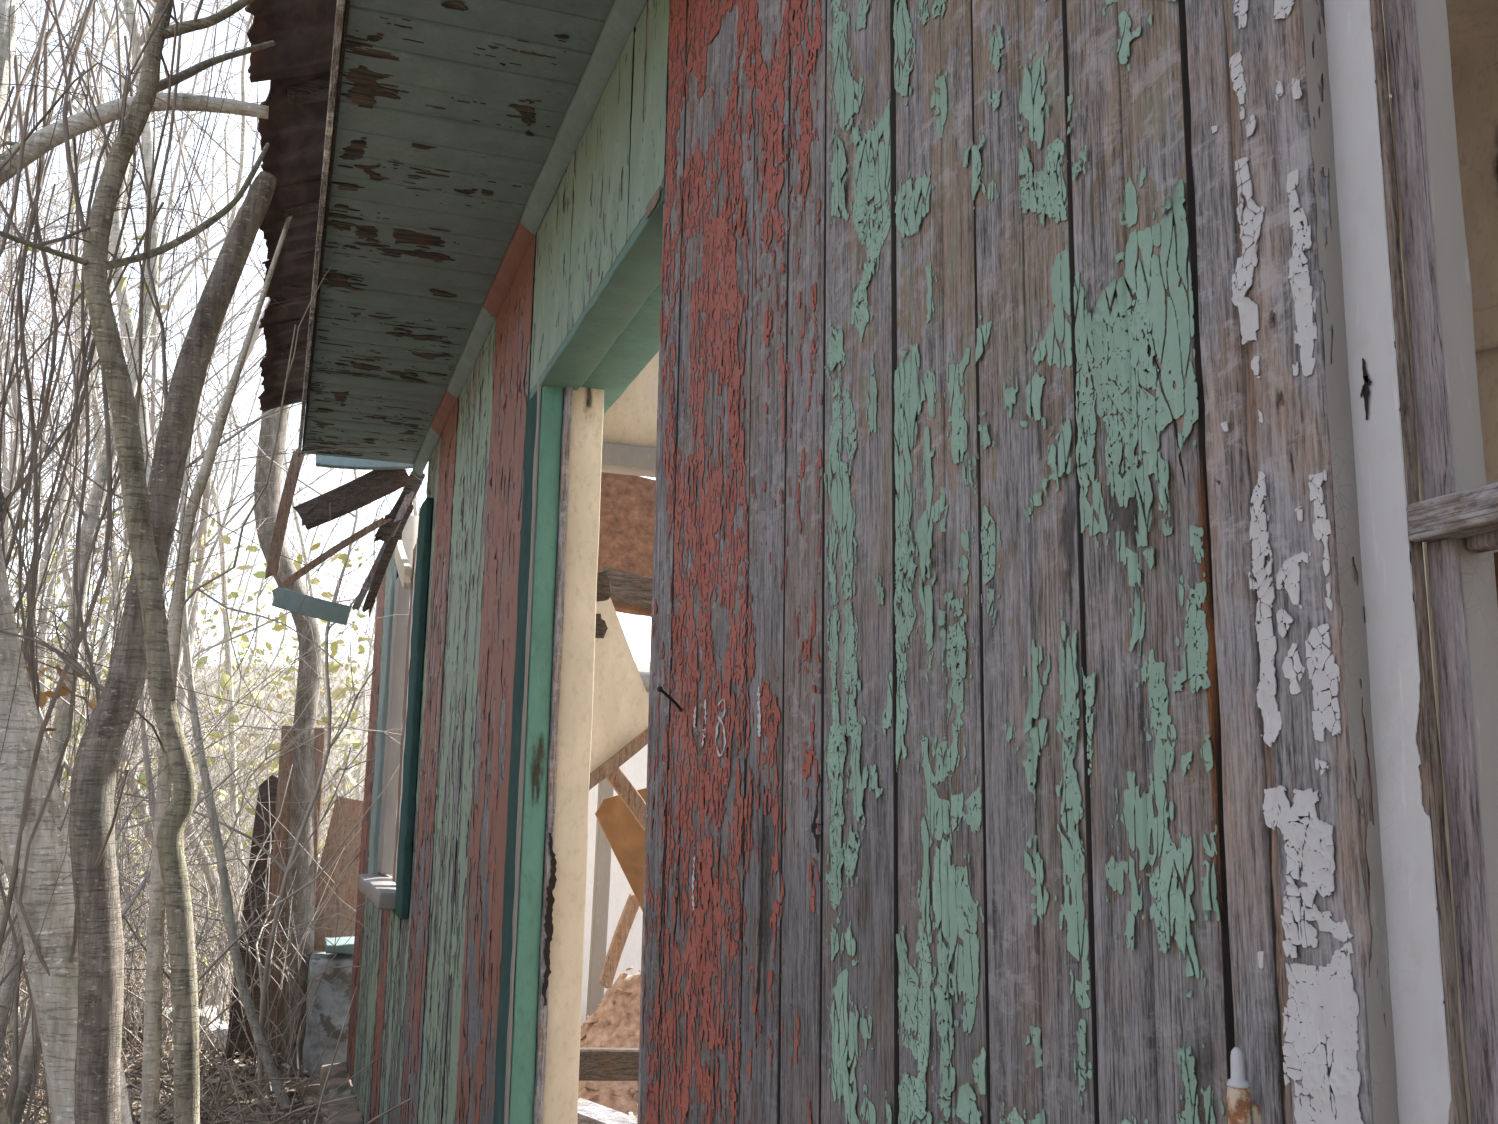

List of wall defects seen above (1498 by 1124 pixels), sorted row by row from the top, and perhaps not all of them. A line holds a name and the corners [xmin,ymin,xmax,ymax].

peeling [1233,0,1248,29]
peeling [1229,50,1256,137]
peeling [1231,157,1265,379]
peeling [305,0,1225,1124]
peeling [1248,0,1452,1124]
crack [542,833,557,1006]